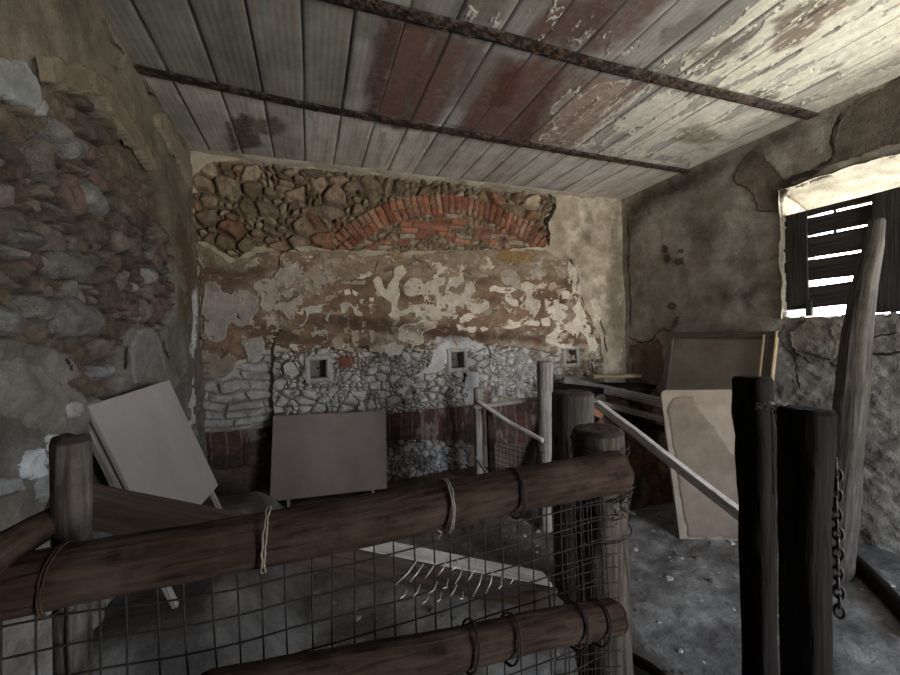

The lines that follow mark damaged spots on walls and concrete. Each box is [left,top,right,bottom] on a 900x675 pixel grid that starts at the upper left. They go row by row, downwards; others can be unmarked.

damp [227,114,284,150]
peeling [365,20,472,130]
peeling [461,0,900,213]
spalling [0,54,175,420]
peeling [152,112,605,481]
crack [627,215,671,343]
crack [784,347,837,389]
crack [873,332,900,356]
peeling [0,434,58,503]